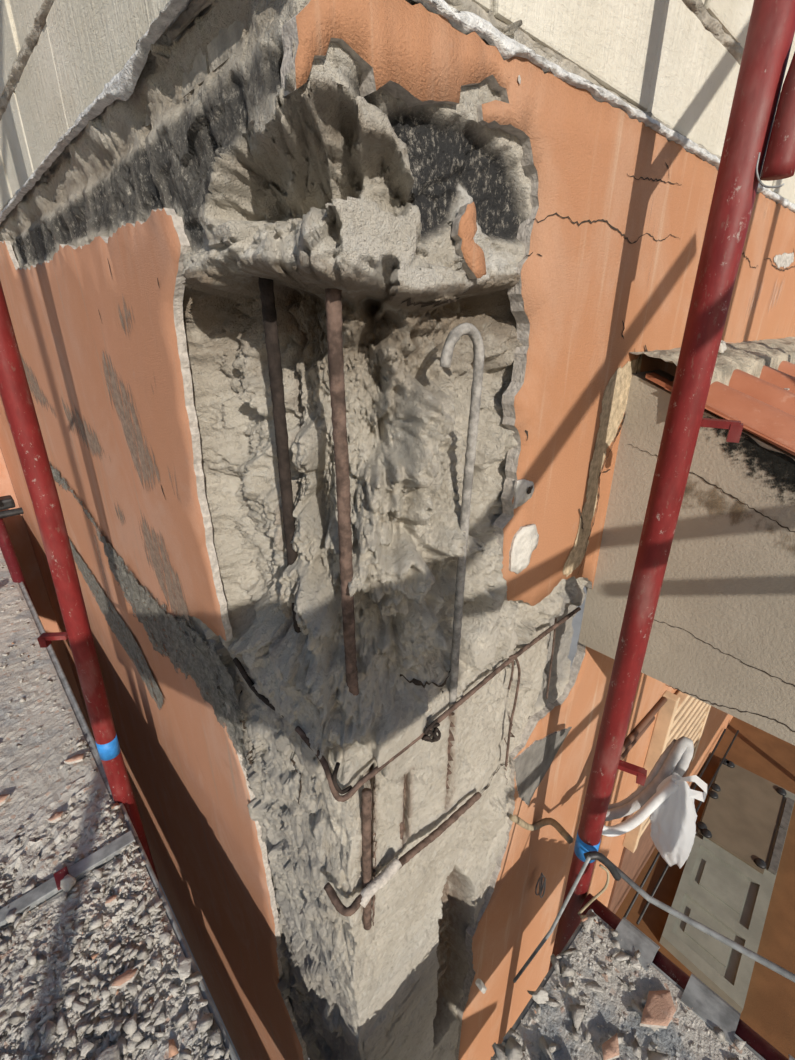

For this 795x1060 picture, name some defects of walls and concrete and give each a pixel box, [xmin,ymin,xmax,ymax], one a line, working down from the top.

crack [627,162,682,185]
crack [533,212,681,244]
crack [742,253,795,271]
spalling [182,67,539,747]
water stain [702,414,795,503]
crack [689,472,795,532]
crack [655,620,795,686]
crack [665,684,795,732]
rust [446,712,455,789]
flaking render [511,727,572,806]
spalling [432,865,476,1052]
flaking render [601,1033,620,1060]